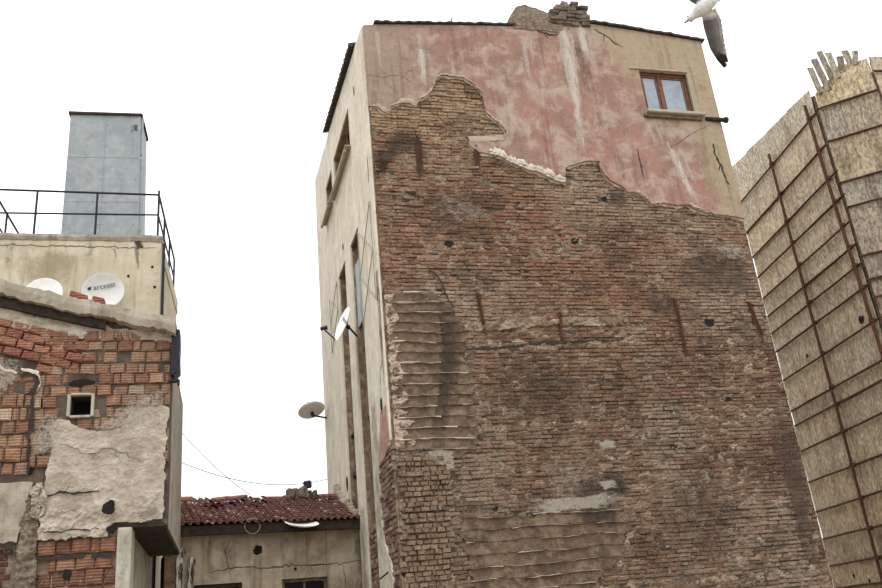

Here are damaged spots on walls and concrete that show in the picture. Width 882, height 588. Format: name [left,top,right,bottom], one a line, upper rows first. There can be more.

spalling [370,73,566,183]
leakage [559,25,590,146]
crack [668,126,730,185]
spalling [378,289,416,465]
crack [59,444,159,470]
crack [209,541,361,585]